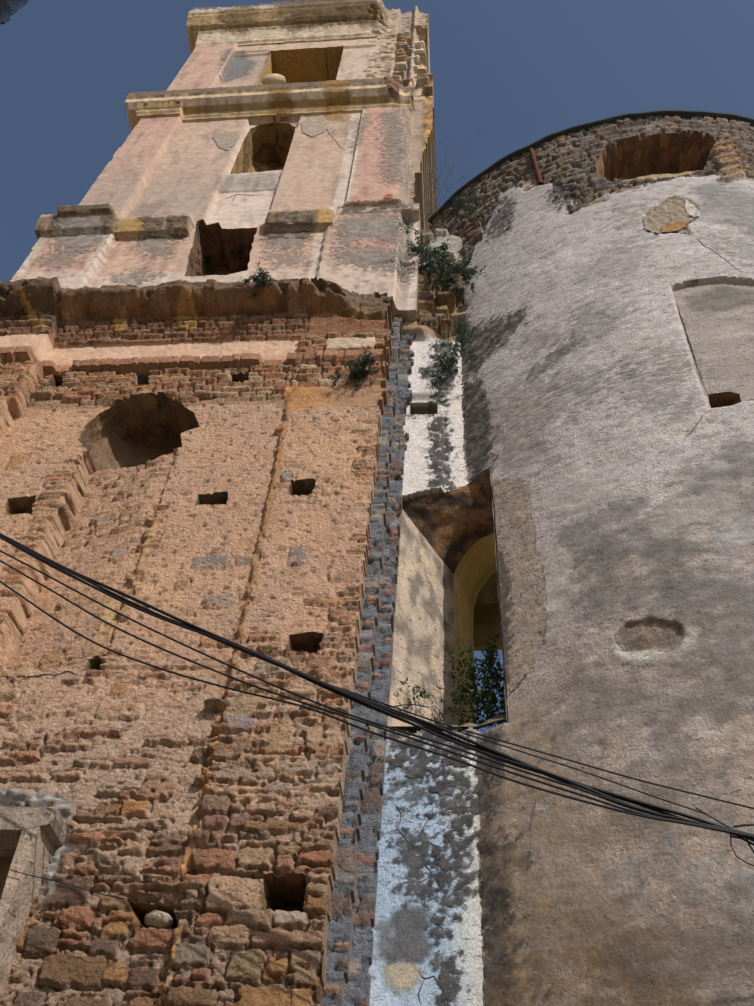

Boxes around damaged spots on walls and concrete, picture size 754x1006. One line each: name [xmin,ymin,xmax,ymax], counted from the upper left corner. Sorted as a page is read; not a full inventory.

spalling [643,195,701,234]
crack [103,512,163,654]
spalling [614,619,698,663]
crack [0,671,89,686]
leakage [378,724,554,1006]